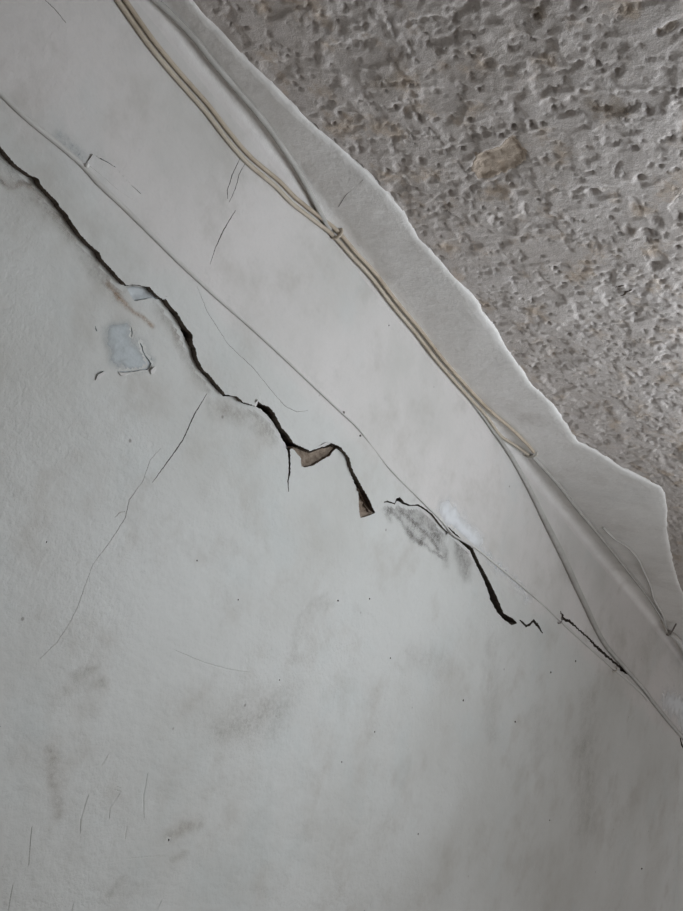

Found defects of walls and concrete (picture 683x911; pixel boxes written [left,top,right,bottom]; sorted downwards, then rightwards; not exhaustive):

crack [0,147,543,659]
crack [560,611,627,674]